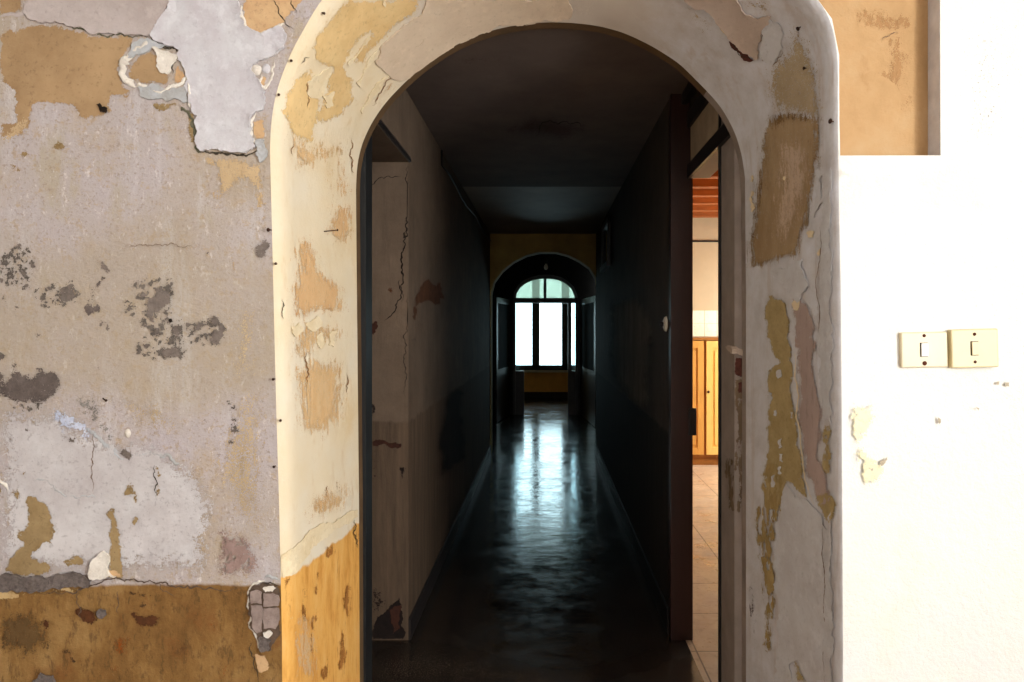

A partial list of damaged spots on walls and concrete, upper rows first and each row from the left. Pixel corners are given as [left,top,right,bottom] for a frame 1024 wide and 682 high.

peeling [0,0,302,163]
peeling [281,0,573,245]
damp [0,352,60,412]
damp [0,243,111,331]
damp [124,277,260,379]
crack [372,167,408,392]
peeling [0,488,55,577]
damp [208,390,268,580]
flaking render [246,485,358,682]
spalling [372,588,406,639]
peeling [746,294,836,653]